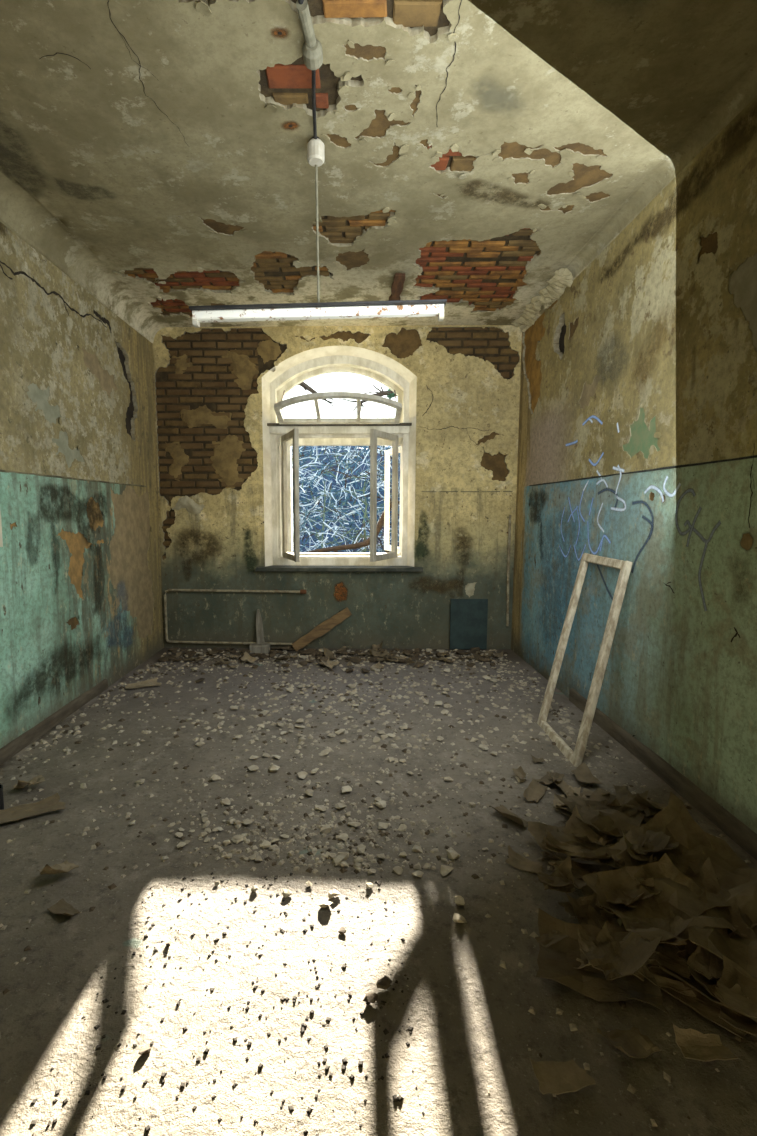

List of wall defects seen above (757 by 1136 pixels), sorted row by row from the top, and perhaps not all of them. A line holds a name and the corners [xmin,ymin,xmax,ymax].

crack [107,0,187,144]
flaking render [178,0,255,17]
flaking render [256,0,613,215]
crack [436,0,462,111]
crack [0,261,111,333]
flaking render [112,207,397,318]
flaking render [381,228,579,414]
spalling [76,341,138,441]
flaking render [153,326,371,565]
spalling [474,432,510,485]
peeling [57,497,105,599]
peeling [465,582,477,599]